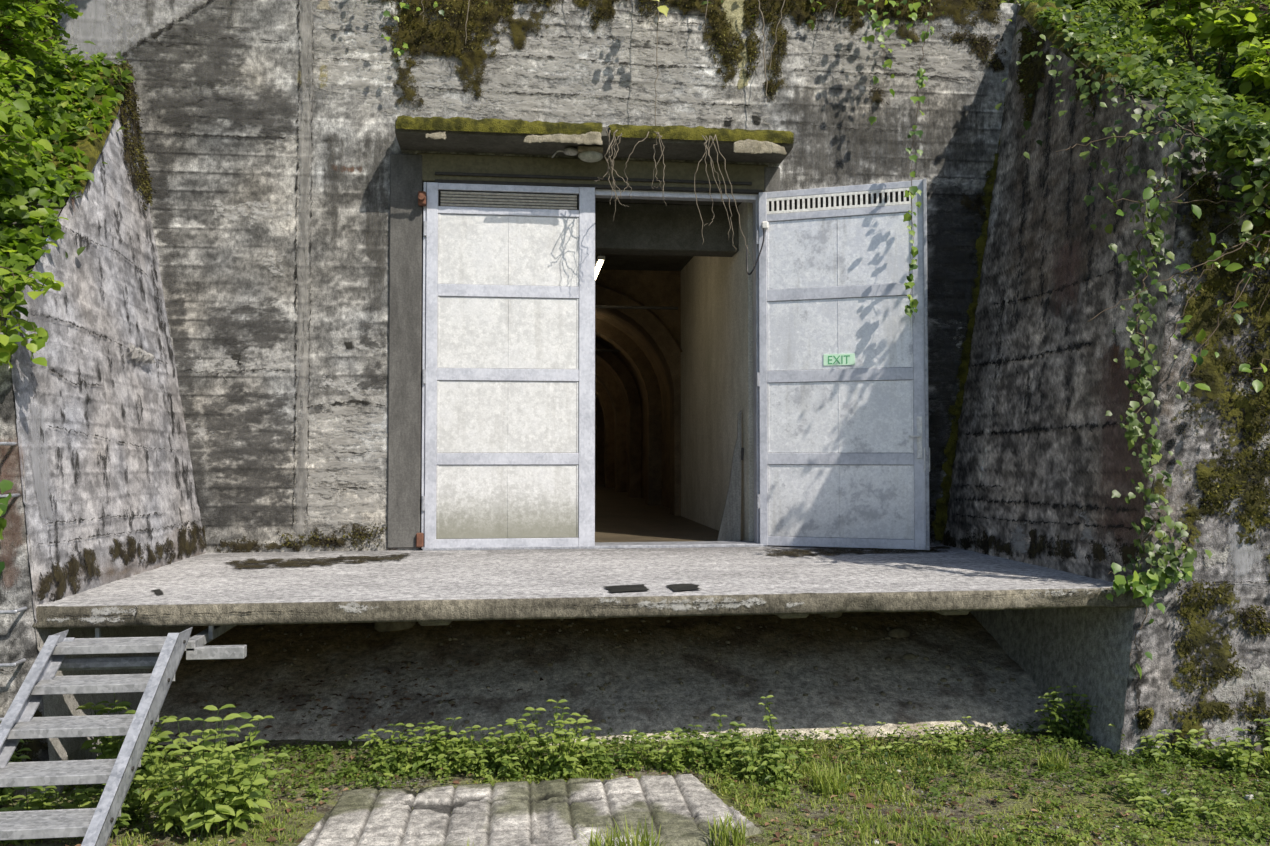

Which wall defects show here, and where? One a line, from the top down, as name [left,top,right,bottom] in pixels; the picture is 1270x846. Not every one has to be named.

water stain [304,0,770,128]
water stain [74,0,389,541]
water stain [780,18,986,542]
water stain [993,78,1126,472]
water stain [40,427,81,484]
water stain [47,489,87,582]
water stain [96,443,153,559]
water stain [1171,408,1199,443]
water stain [1228,488,1263,577]